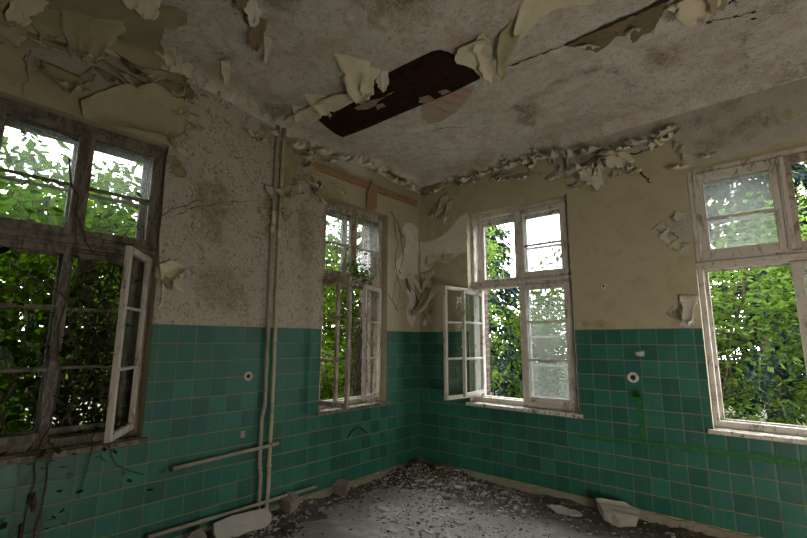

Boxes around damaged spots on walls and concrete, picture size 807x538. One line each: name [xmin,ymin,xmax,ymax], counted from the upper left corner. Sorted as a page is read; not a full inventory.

peeling [0,0,807,329]
crack [497,44,569,71]